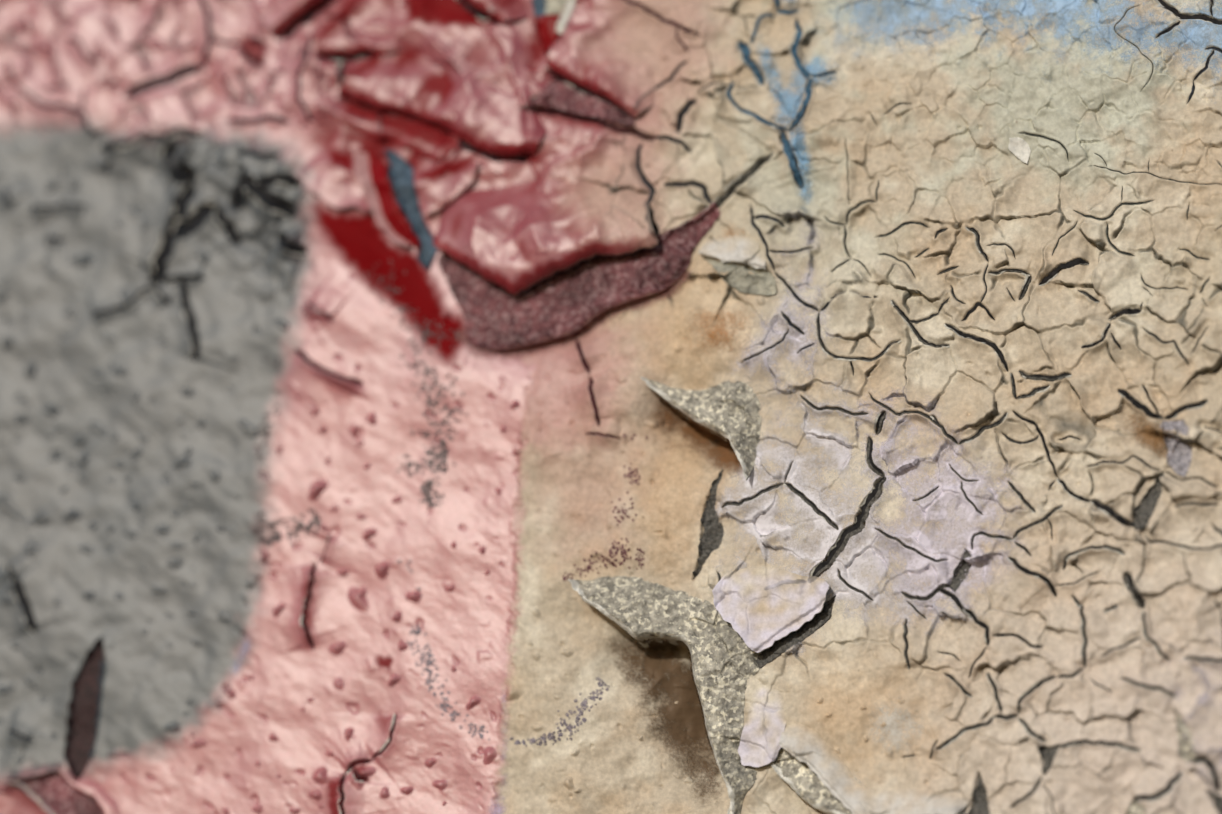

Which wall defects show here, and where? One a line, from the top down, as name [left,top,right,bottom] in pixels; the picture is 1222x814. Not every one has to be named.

peeling [258,0,326,39]
peeling [463,0,530,23]
crack [5,0,528,361]
peeling [298,23,777,351]
peeling [641,377,762,480]
crack [530,0,1222,759]
crack [299,534,331,650]
peeling [567,469,990,814]
peeling [0,639,121,814]
crack [337,714,396,814]
crack [1010,777,1055,814]
crack [1133,758,1219,802]